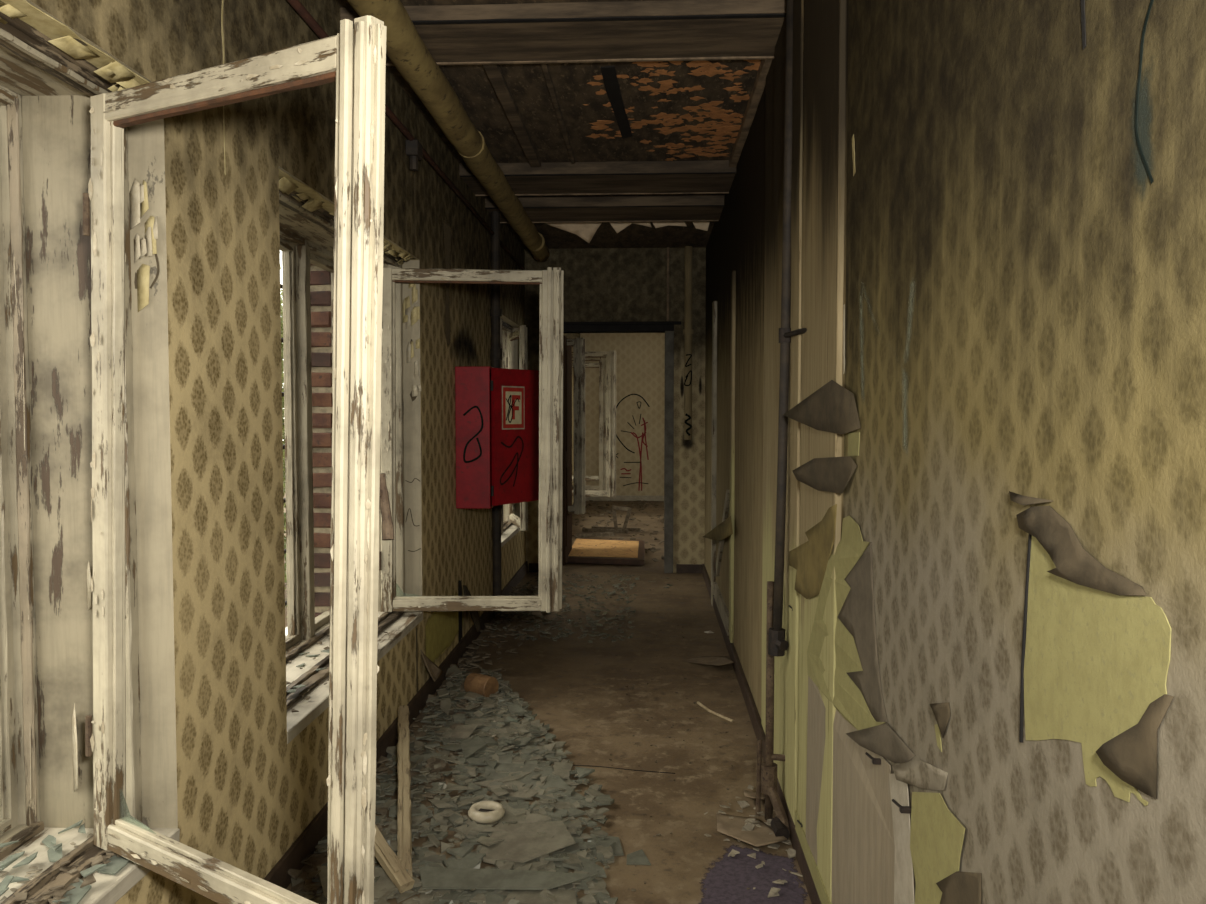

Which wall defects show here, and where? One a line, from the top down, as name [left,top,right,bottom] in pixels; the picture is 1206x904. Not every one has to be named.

peeling [0,0,200,114]
peeling [583,59,761,161]
peeling [90,443,103,522]
peeling [806,676,915,904]